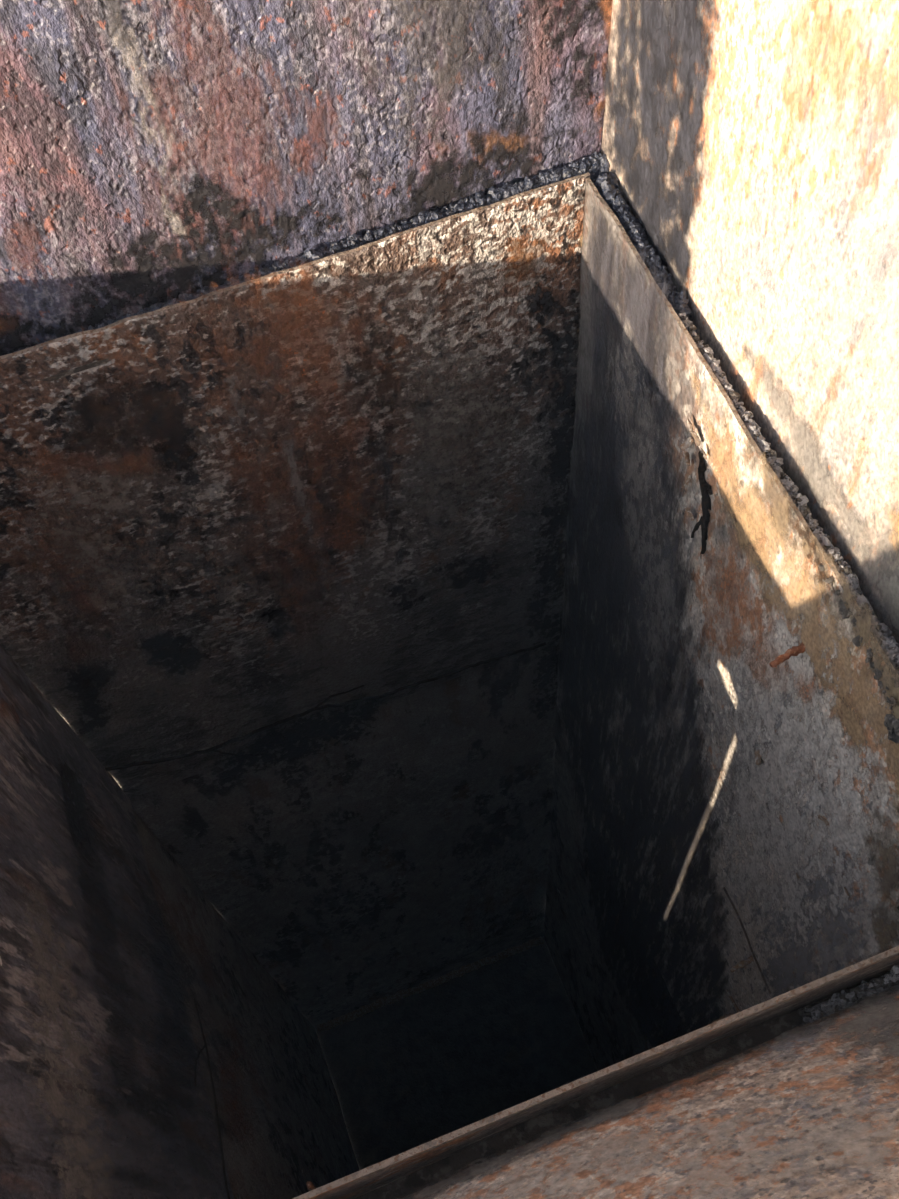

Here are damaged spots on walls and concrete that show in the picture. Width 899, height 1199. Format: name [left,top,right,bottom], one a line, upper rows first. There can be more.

leakage [169,174,242,244]
rust [706,420,899,806]